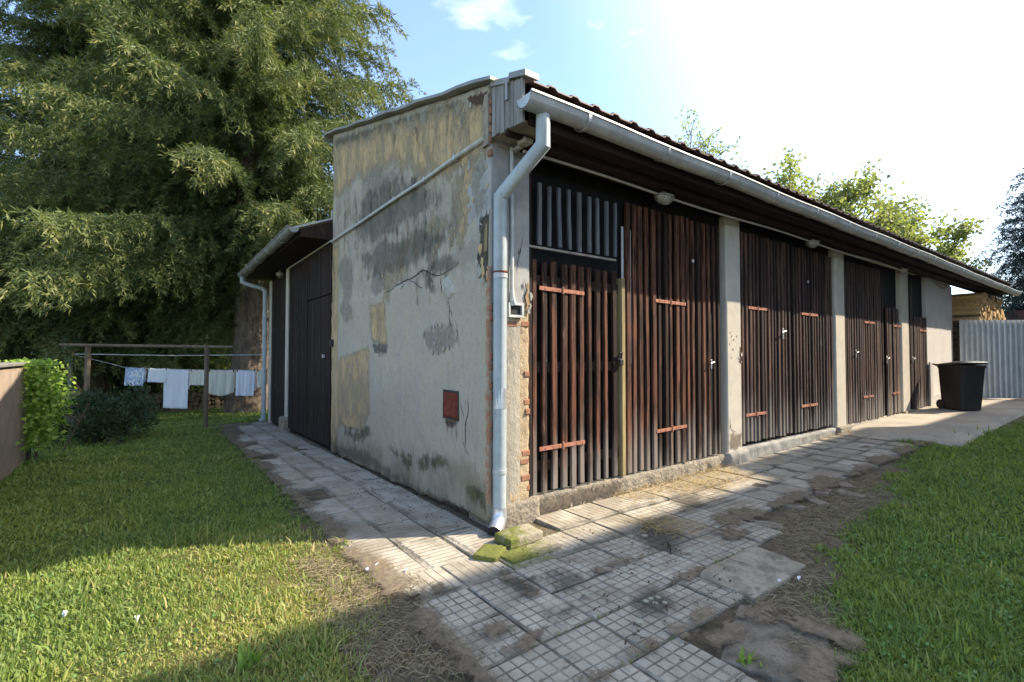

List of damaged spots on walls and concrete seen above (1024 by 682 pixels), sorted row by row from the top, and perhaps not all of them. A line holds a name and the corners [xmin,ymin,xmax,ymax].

crack [392,235,460,349]
flaking render [373,342,387,357]
flaking render [475,208,493,504]